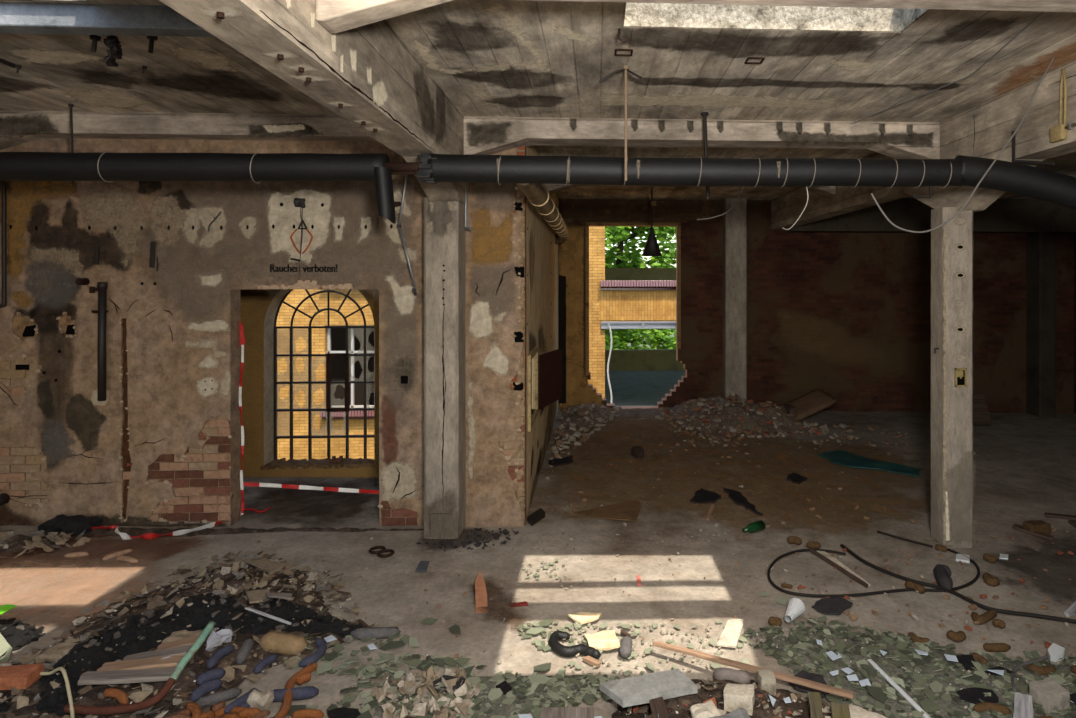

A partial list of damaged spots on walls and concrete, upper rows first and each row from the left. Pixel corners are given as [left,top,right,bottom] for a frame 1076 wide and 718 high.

damp [414,3,550,139]
damp [25,261,80,308]
damp [37,381,106,465]
crack [435,293,459,537]
flaking render [0,444,48,507]
flaking render [145,415,232,523]
flaking render [378,500,418,526]
crack [392,467,417,499]